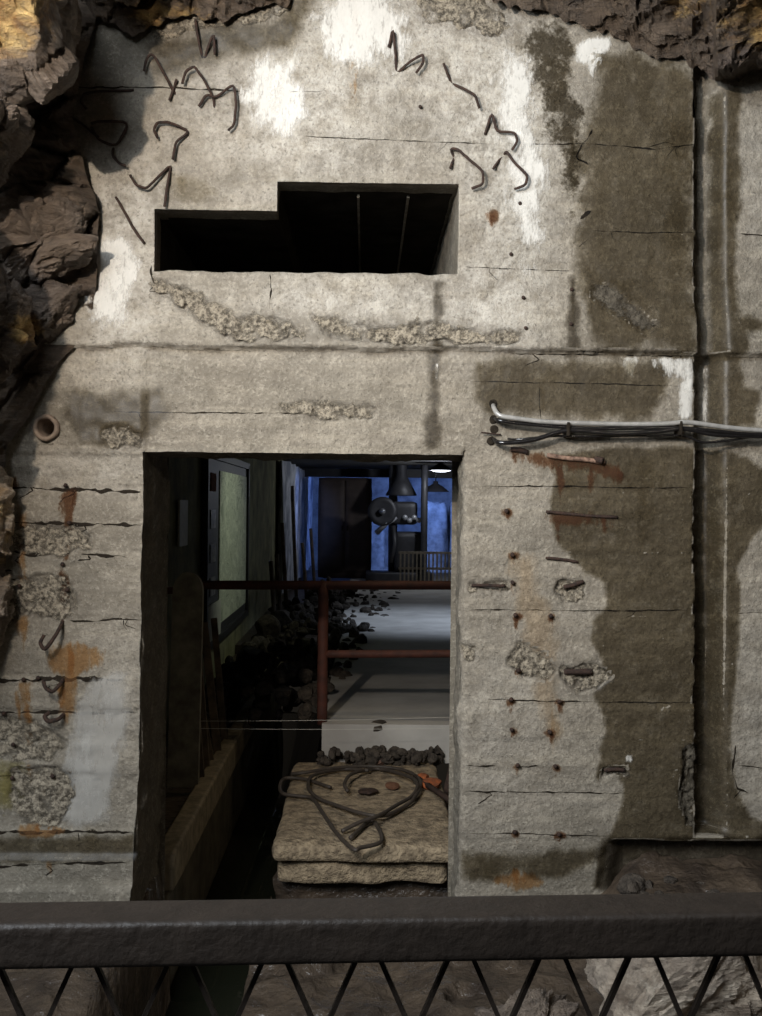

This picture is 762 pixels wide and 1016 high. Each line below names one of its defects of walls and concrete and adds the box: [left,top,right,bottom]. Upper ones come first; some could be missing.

damp [498,22,610,245]
spalling [148,279,306,344]
damp [567,280,578,348]
spalling [279,400,374,420]
damp [624,357,637,374]
efflorescence [653,358,707,420]
spalling [102,427,141,449]
spalling [12,525,92,559]
spalling [8,573,78,622]
spalling [508,640,609,695]
spalling [0,717,75,826]